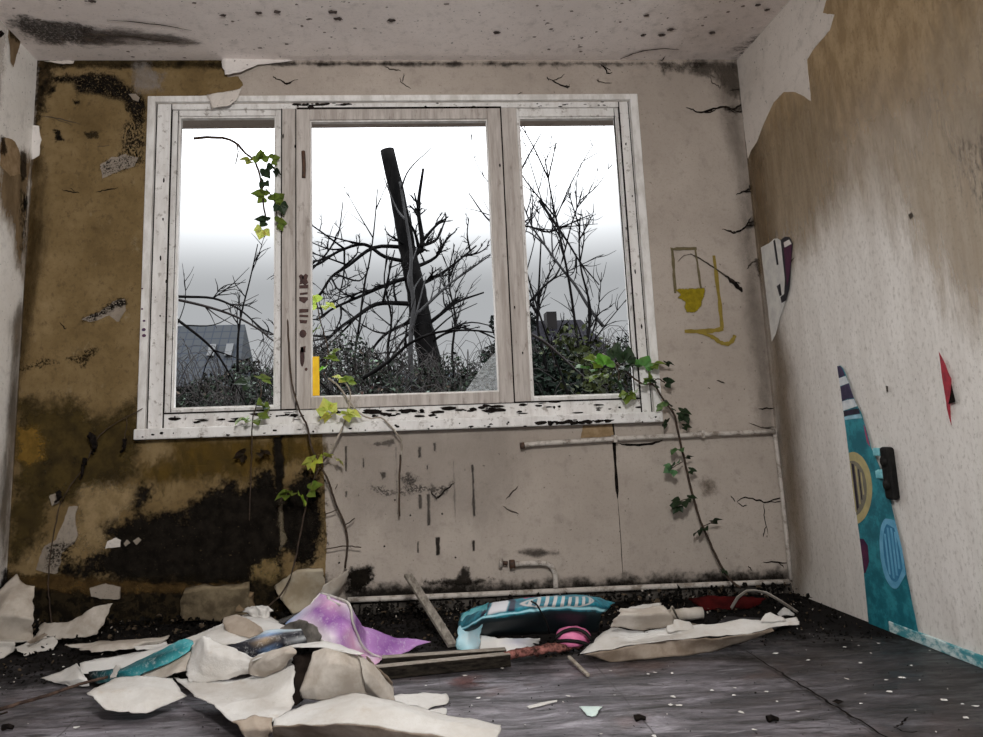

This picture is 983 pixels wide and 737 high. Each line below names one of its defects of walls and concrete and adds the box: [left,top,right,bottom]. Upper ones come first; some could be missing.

damp [7,8,222,164]
damp [662,27,756,98]
crack [686,75,742,113]
crack [724,218,756,234]
damp [749,0,983,307]
damp [0,156,55,589]
damp [68,348,99,368]
flaking render [0,60,333,600]
damp [32,435,329,631]
peeling [362,402,621,438]
damp [344,331,801,607]
crack [731,496,781,536]